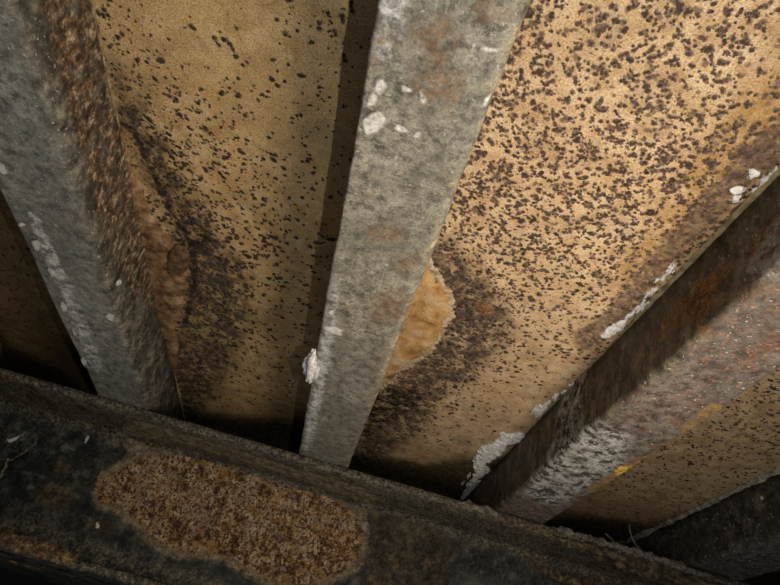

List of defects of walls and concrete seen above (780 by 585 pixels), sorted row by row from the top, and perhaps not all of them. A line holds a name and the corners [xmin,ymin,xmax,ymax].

leakage [0,212,102,391]
peeling [380,257,456,390]
leakage [348,0,780,543]